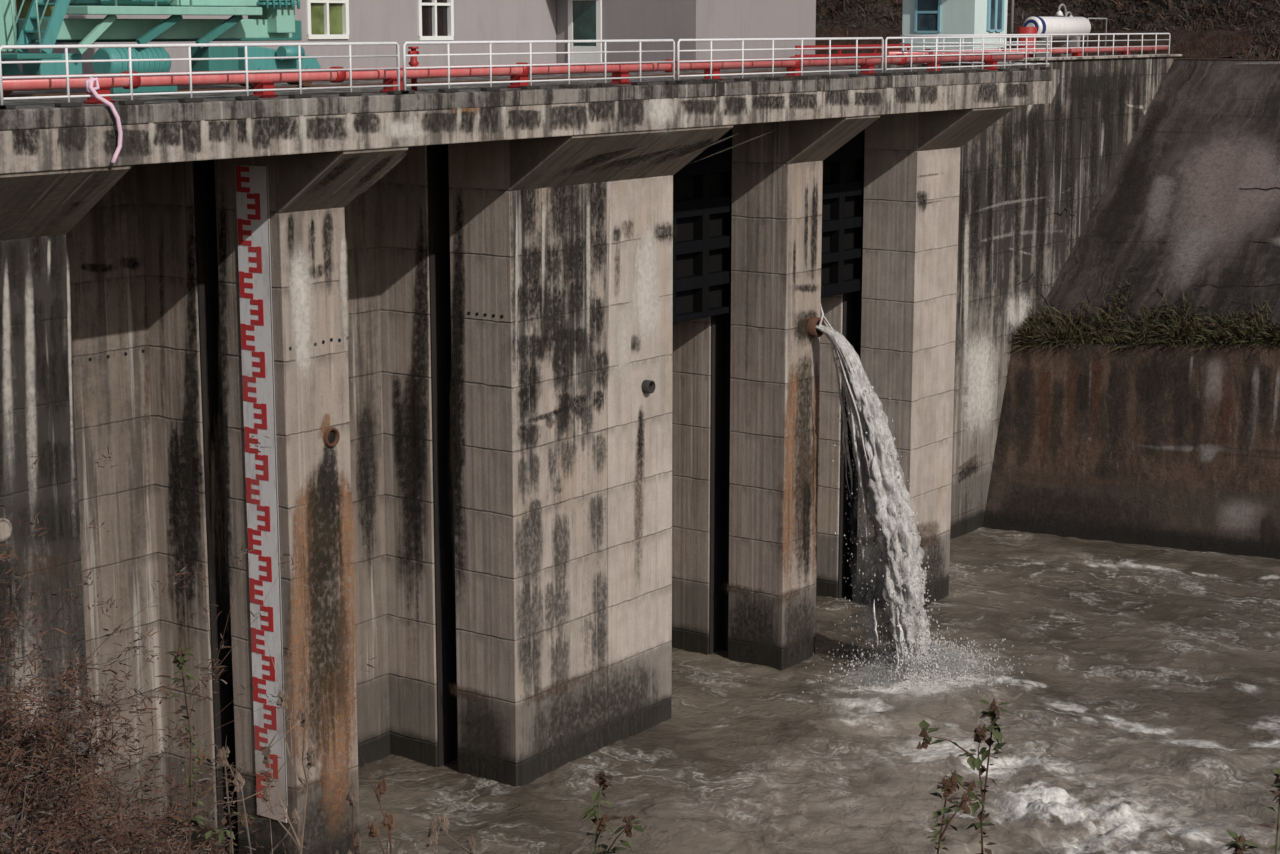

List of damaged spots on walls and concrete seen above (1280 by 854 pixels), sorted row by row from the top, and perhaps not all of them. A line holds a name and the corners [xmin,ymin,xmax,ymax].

leakage [12,129,39,154]
leakage [58,127,86,150]
crack [1239,185,1280,193]
leakage [63,69,1280,582]
leakage [513,133,767,771]
rust [783,357,820,574]
rust [288,414,355,817]
leakage [454,686,509,784]